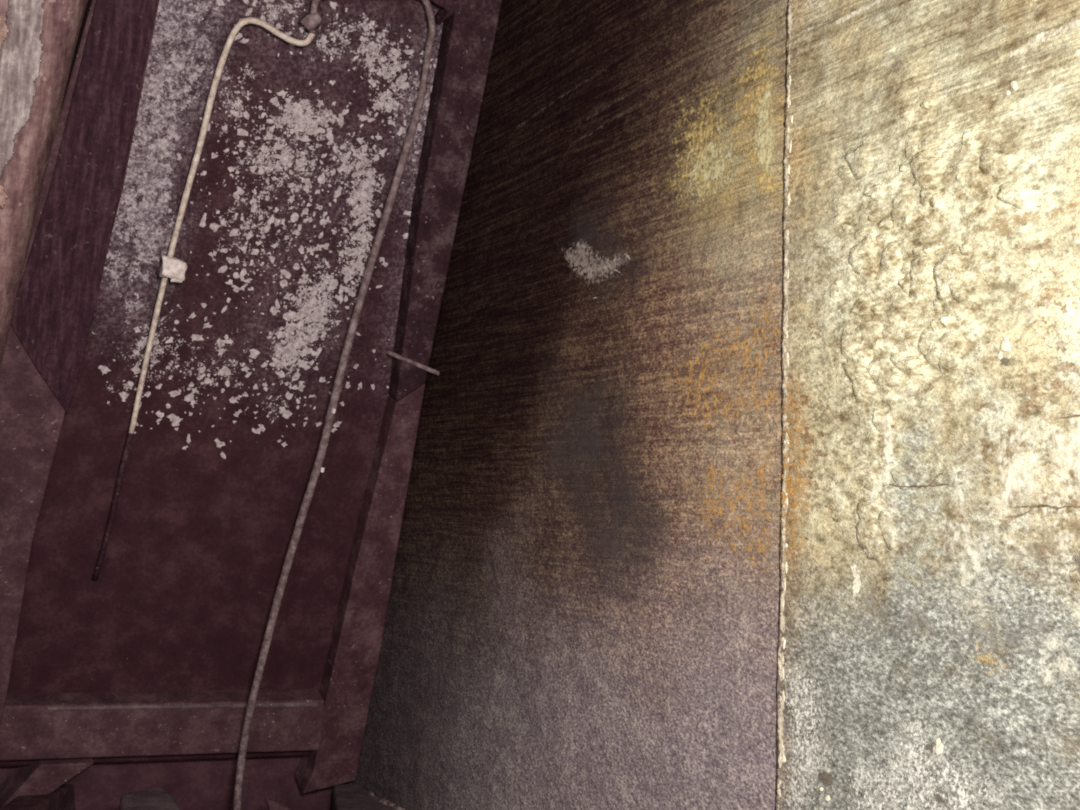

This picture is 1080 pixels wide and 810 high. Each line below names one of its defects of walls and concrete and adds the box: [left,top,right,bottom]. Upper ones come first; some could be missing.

peeling [0,0,44,208]
corrosion [668,12,785,215]
corrosion [660,285,813,570]
crack [1008,504,1080,517]